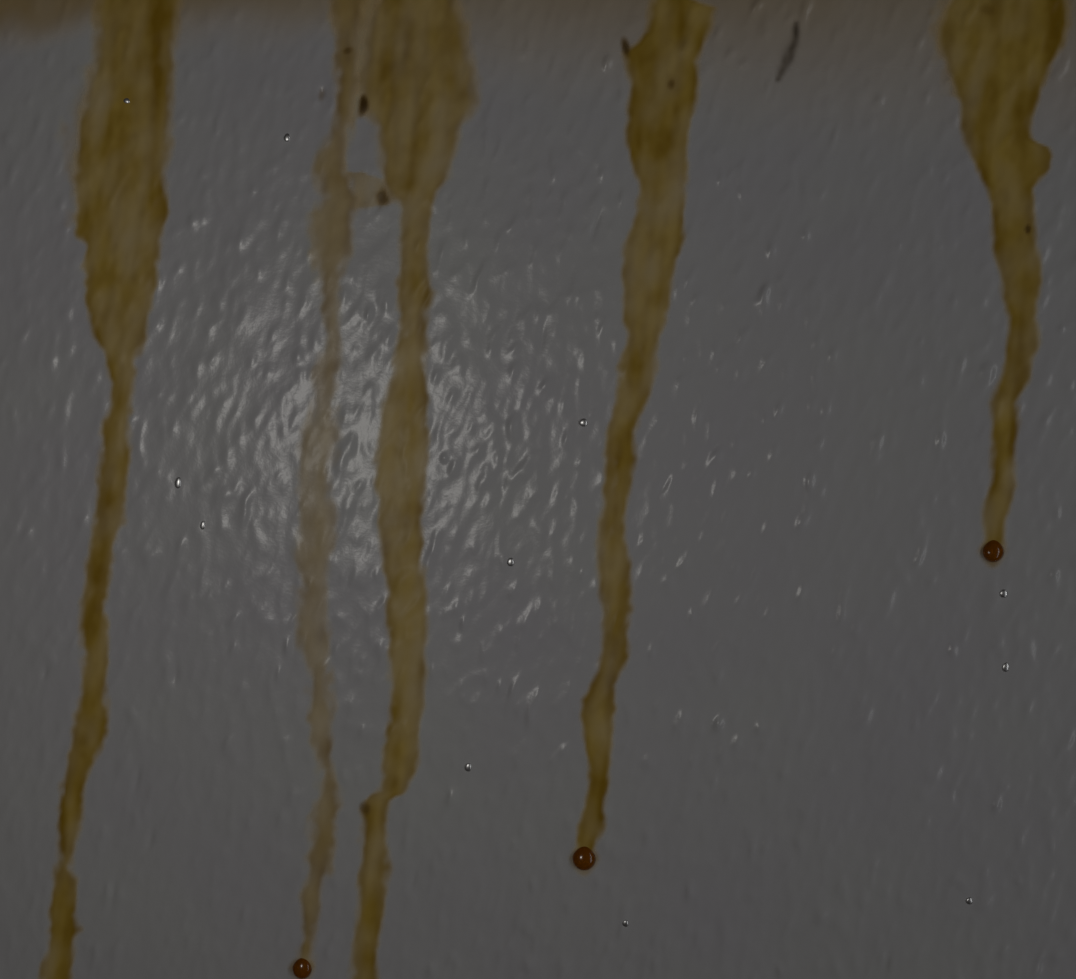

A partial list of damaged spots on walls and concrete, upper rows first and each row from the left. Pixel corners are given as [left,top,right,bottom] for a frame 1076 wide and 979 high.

damp [0,0,477,979]
damp [454,0,1076,872]